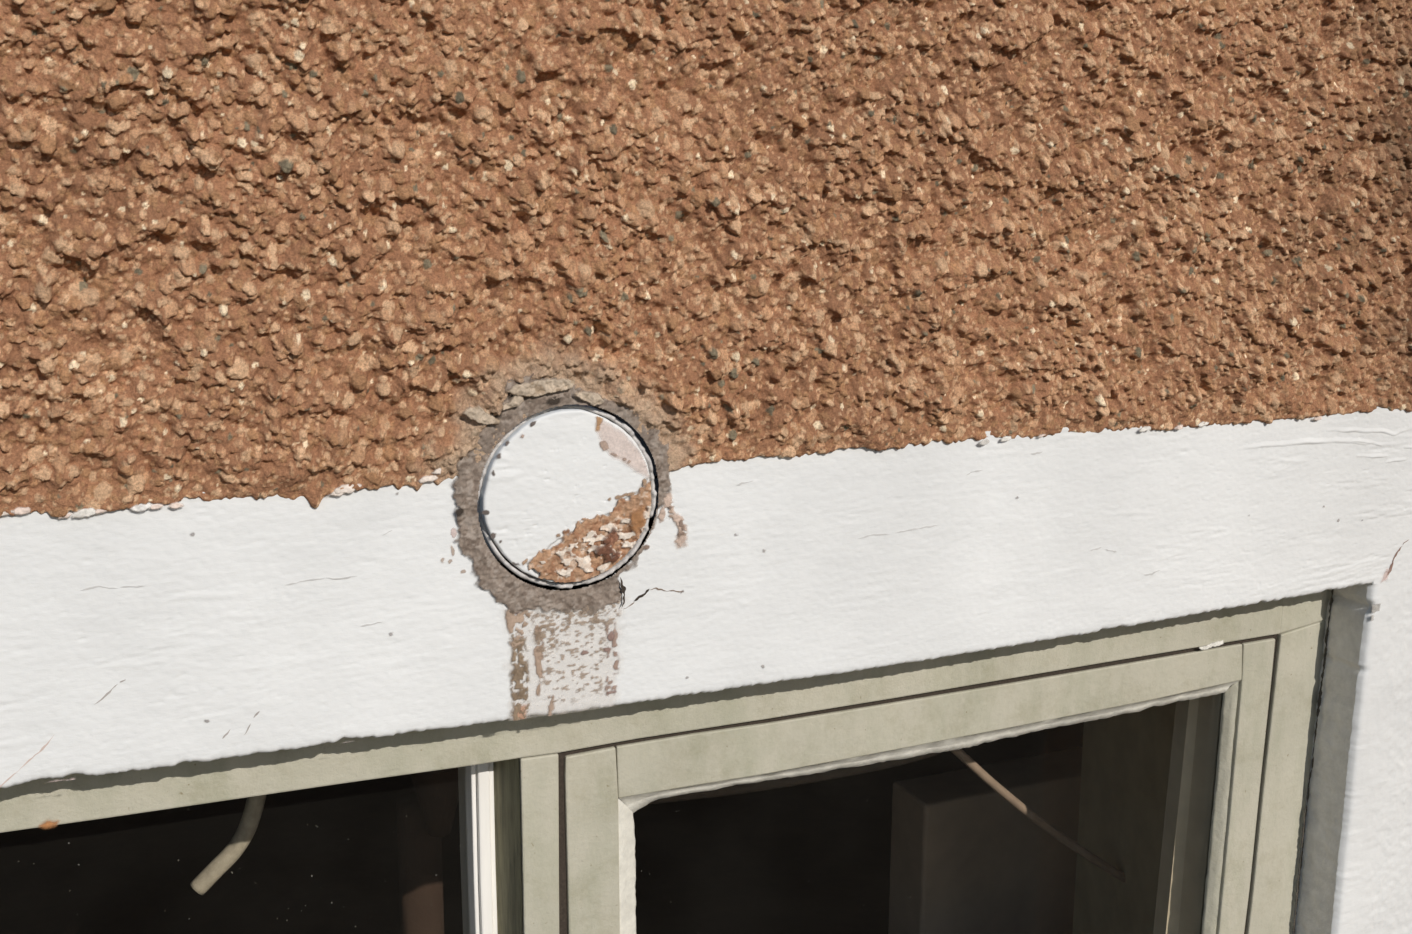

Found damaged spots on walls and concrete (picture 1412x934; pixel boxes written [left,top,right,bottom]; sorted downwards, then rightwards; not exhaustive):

peeling [324,484,362,497]
spalling [419,373,687,720]